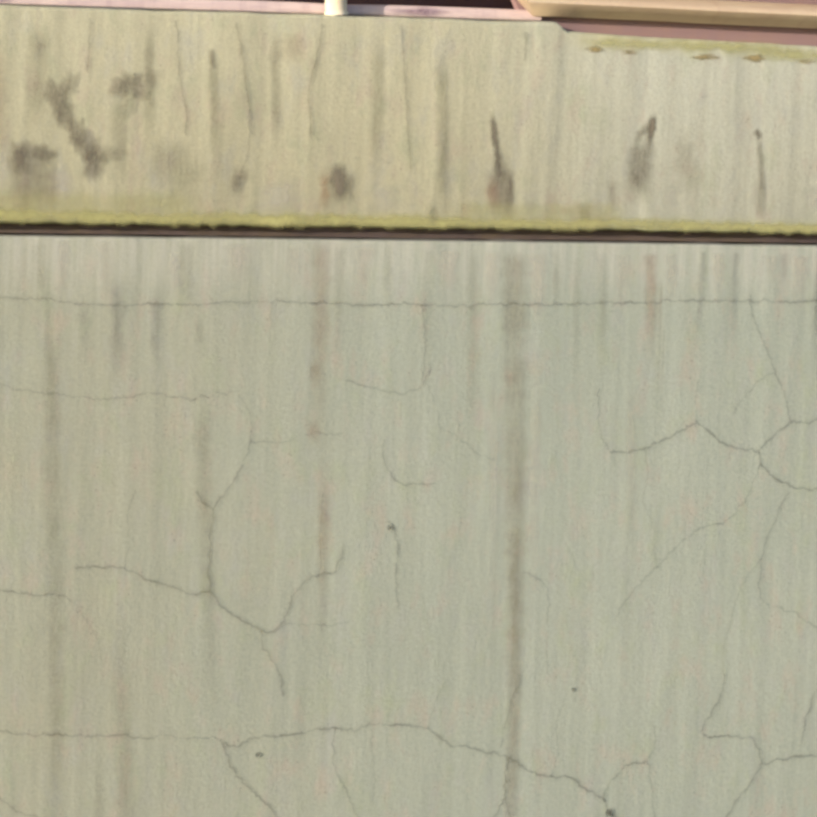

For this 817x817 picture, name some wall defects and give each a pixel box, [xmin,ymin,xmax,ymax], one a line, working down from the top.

water stain [492,120,500,170]